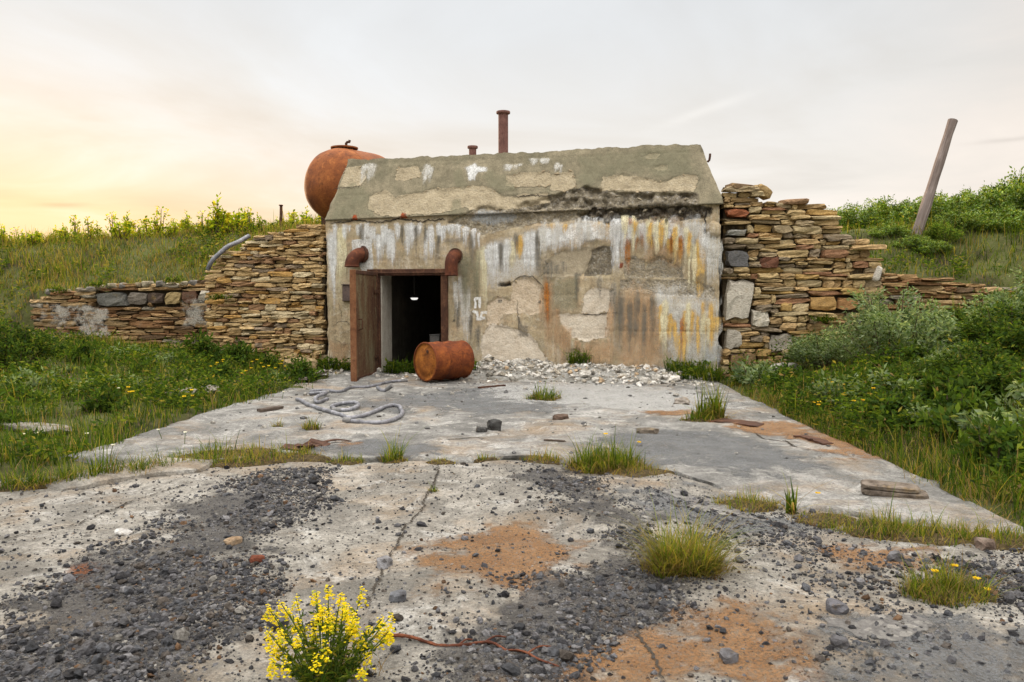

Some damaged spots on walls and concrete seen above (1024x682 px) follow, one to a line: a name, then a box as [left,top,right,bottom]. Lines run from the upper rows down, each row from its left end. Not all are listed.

peeling [368,153,712,235]
water stain [326,188,723,366]
peeling [480,246,716,361]
rust [551,216,719,361]
crack [365,466,470,608]